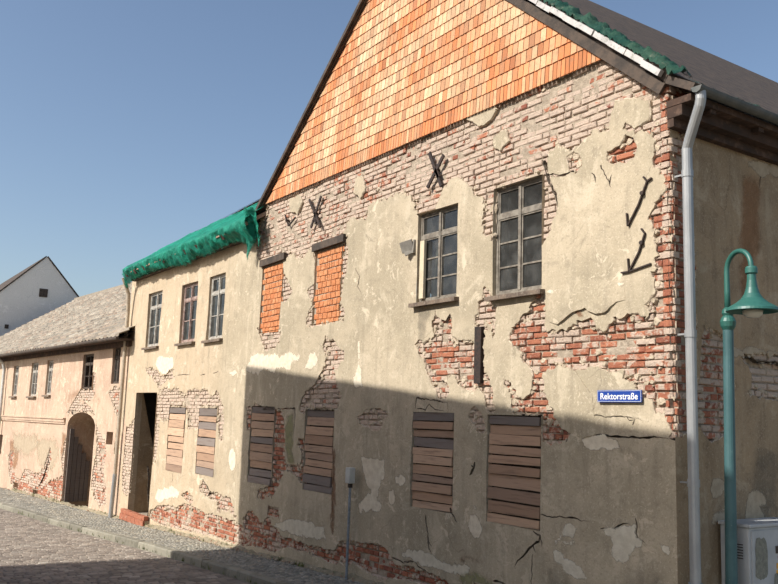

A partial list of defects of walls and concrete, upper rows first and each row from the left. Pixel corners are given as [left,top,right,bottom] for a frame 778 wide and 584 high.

flaking render [748,161,778,177]
spalling [256,60,694,446]
spalling [696,313,724,443]
spalling [734,346,778,401]
spalling [8,437,66,501]
spalling [67,372,135,508]
spalling [146,327,470,584]
flaking render [582,434,620,451]
flaking render [745,490,766,519]
flaking render [553,523,587,579]
crack [515,514,646,584]
flaking render [604,523,642,563]